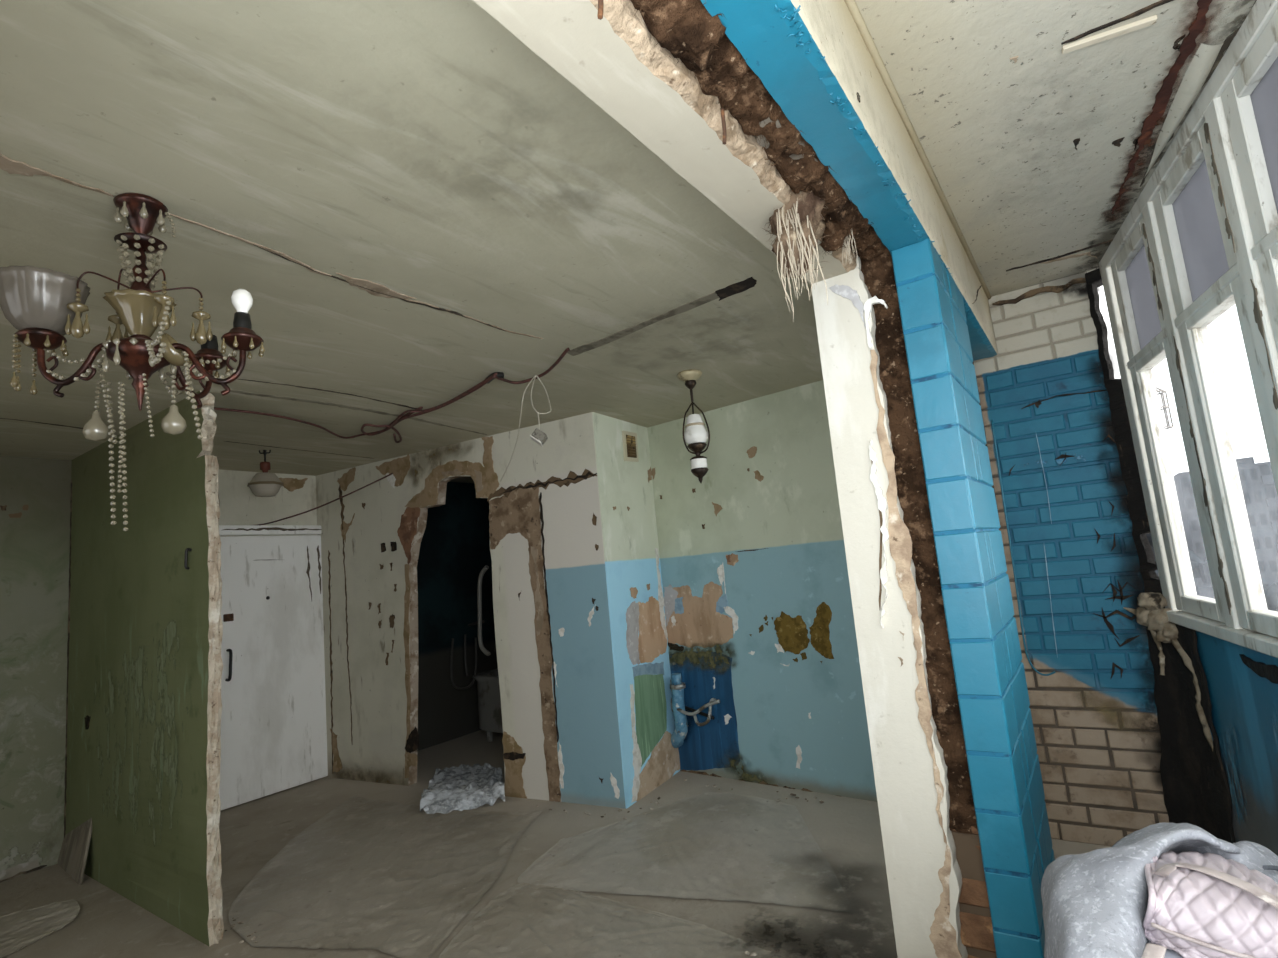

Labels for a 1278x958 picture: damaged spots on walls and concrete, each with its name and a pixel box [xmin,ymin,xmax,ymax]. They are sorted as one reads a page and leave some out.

crack [1061,0,1174,45]
crack [0,153,114,197]
spalling [756,117,781,149]
rust [1107,0,1216,222]
crack [168,213,543,339]
spalling [368,436,499,778]
peeling [599,548,740,803]
spalling [829,284,962,958]
spalling [502,731,527,799]